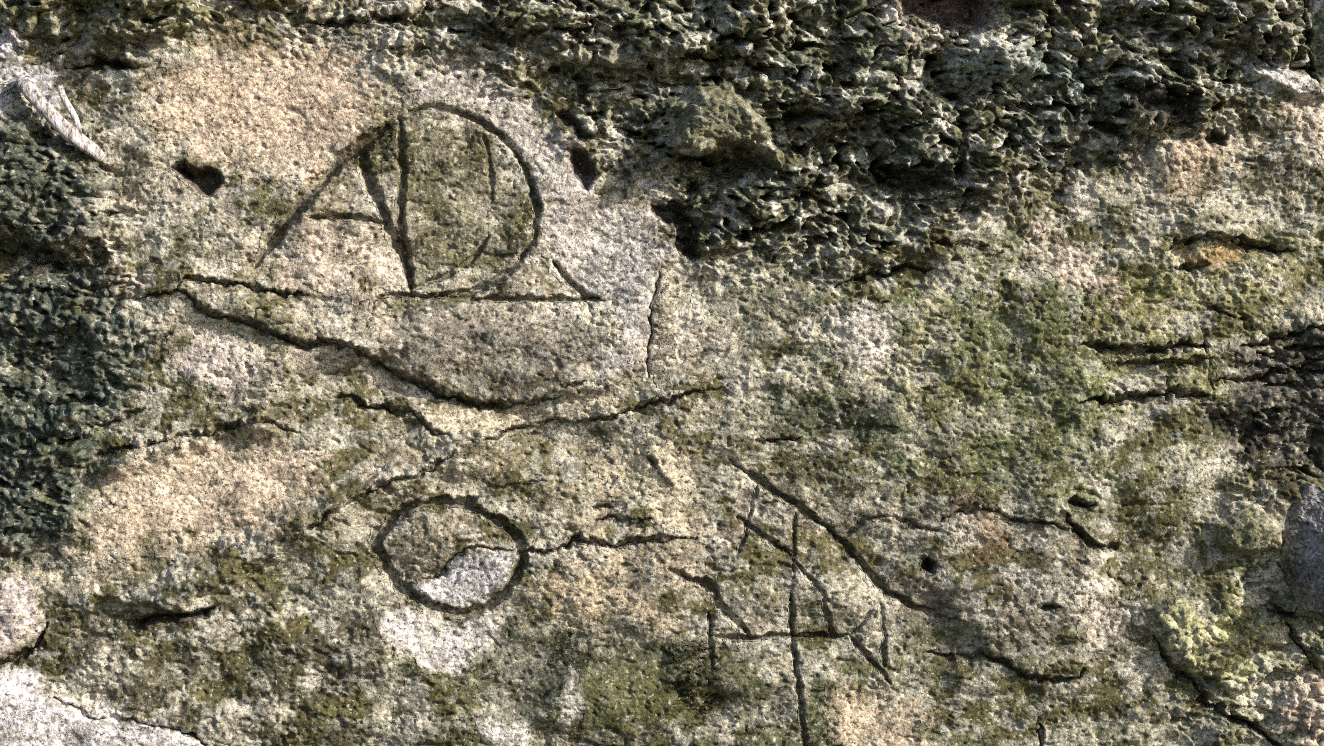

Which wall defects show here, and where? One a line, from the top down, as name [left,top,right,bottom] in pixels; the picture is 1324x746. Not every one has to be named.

crack [176,274,718,531]
crack [528,504,687,555]
crack [432,563,447,579]